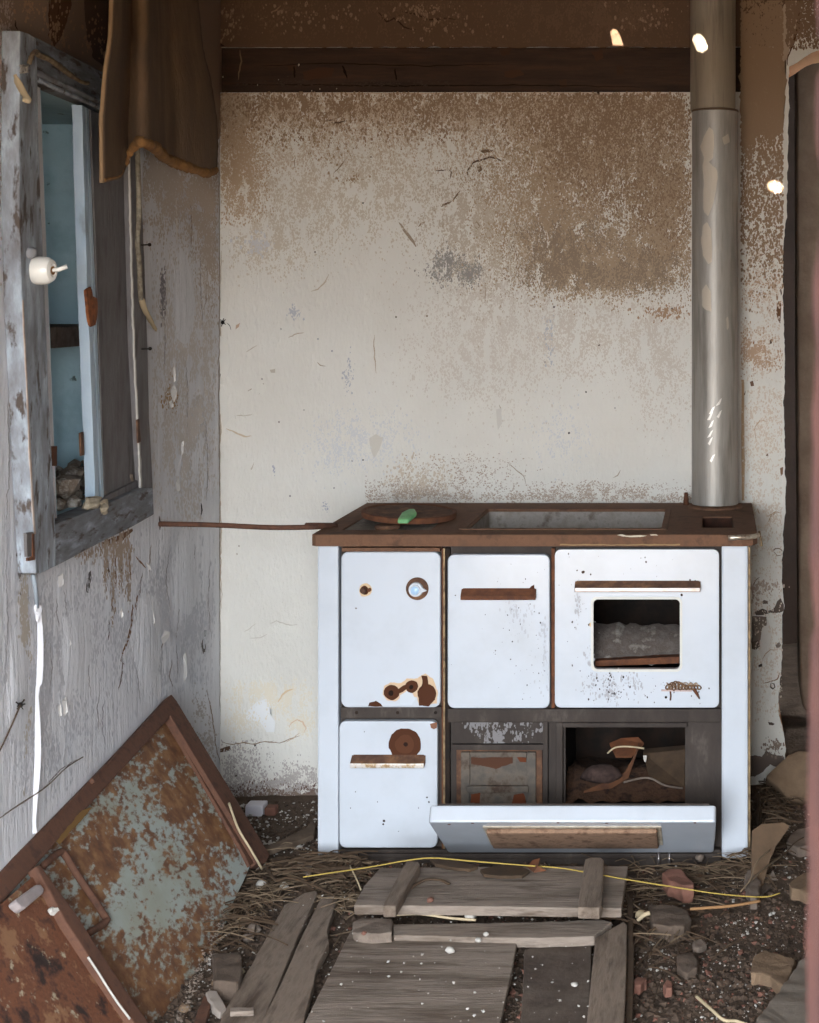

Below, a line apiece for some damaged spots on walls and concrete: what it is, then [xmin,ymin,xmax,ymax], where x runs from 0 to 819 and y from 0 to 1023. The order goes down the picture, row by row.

damp [0,88,692,806]
flaking render [750,579,790,650]